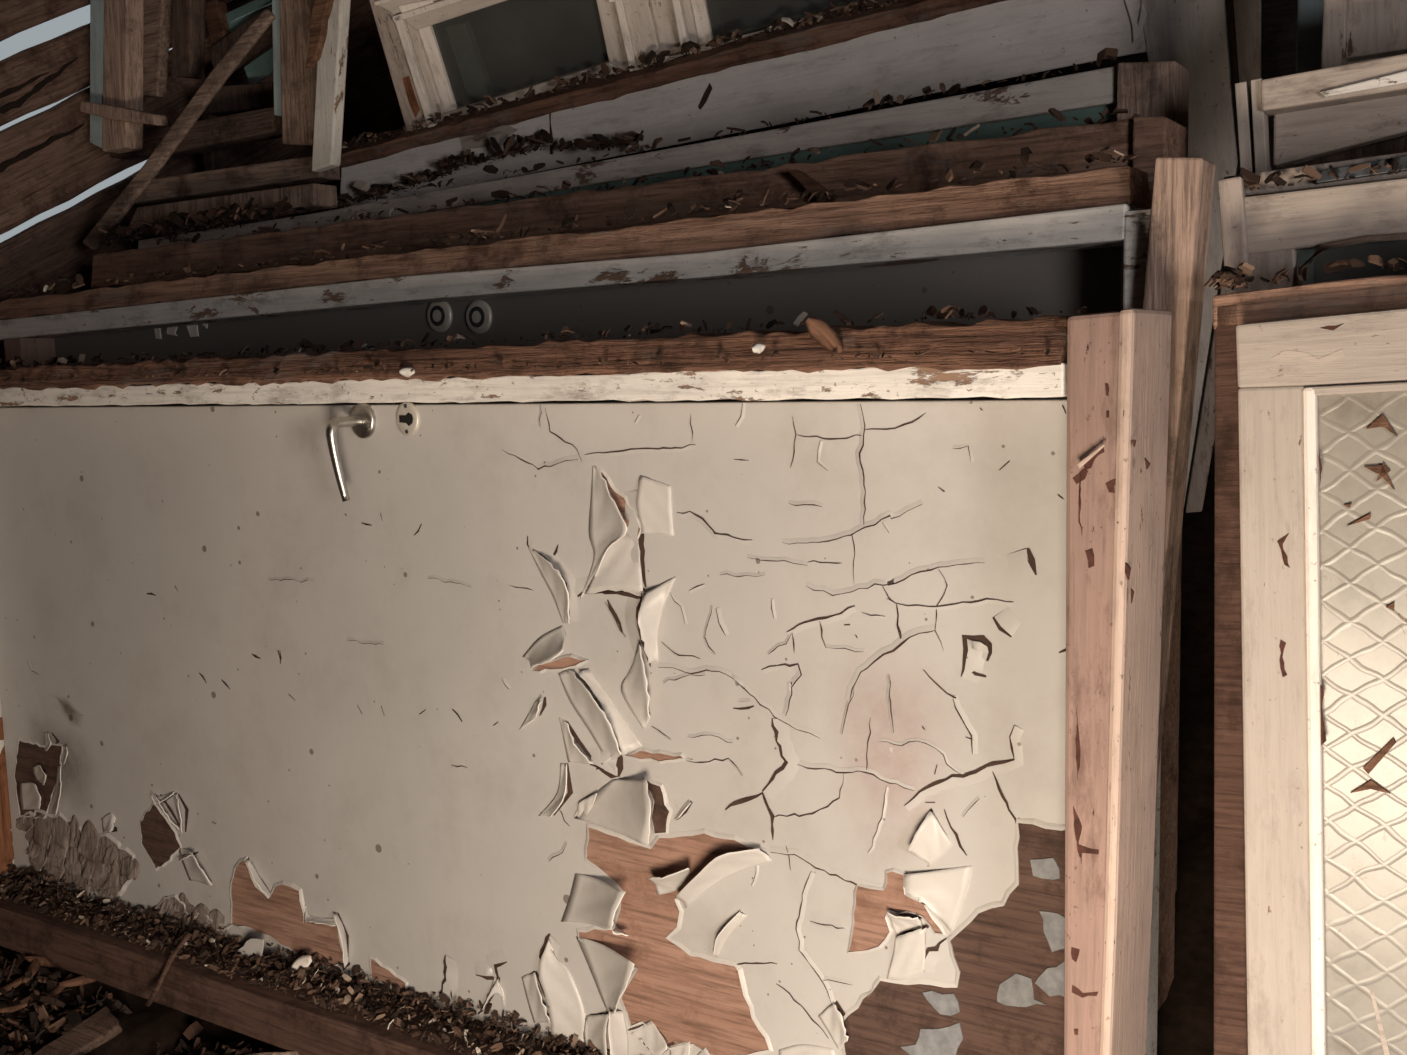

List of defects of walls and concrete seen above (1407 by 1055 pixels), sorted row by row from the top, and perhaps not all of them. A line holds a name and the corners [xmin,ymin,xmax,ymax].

peeling [0,733,349,972]
crack [502,403,1037,1039]
peeling [519,465,1065,1055]
peeling [370,956,408,991]
peeling [482,977,505,1010]